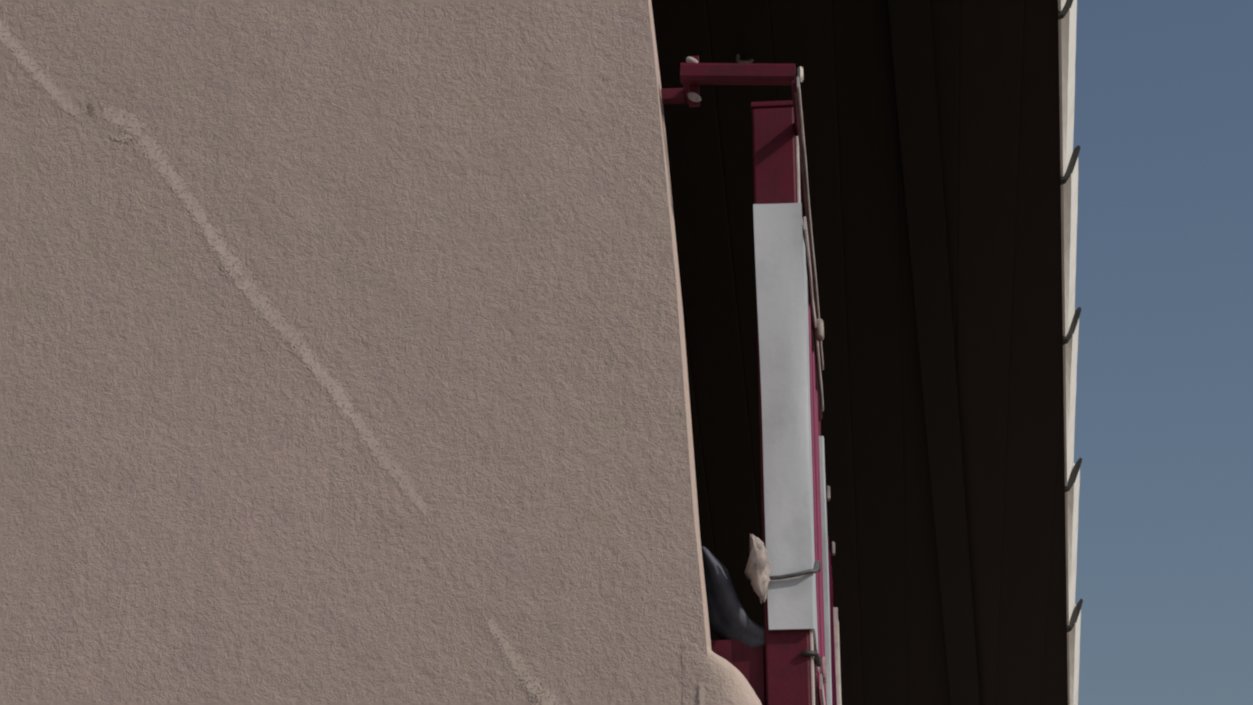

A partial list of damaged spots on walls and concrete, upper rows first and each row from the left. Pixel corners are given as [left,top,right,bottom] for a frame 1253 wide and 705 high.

crack [0,11,431,523]
crack [479,607,567,705]